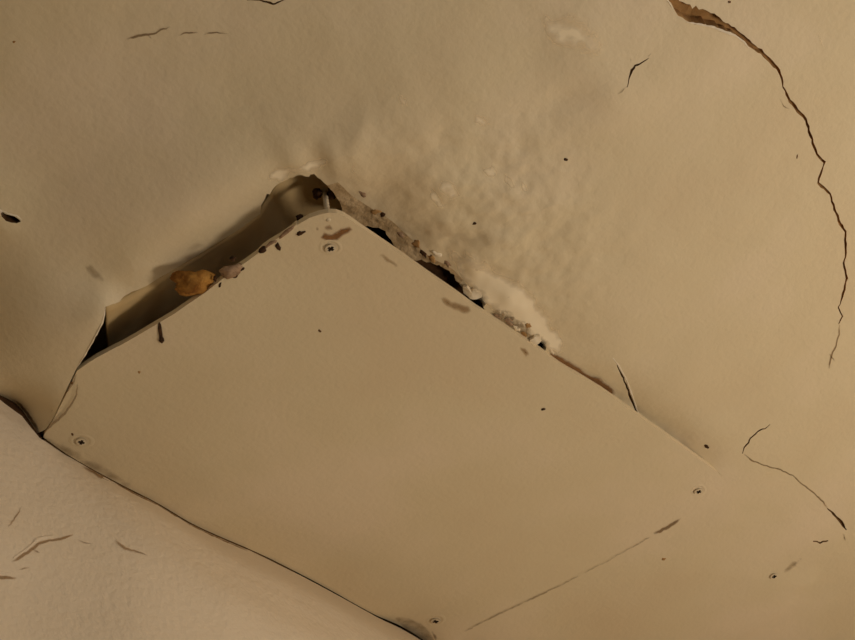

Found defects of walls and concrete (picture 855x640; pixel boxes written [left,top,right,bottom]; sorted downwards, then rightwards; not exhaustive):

crack [627,58,649,87]
flaking render [327,182,482,300]
peeling [390,131,581,232]
crack [666,0,848,365]
flaking render [494,314,541,346]
crack [0,379,295,572]
crack [742,425,846,544]